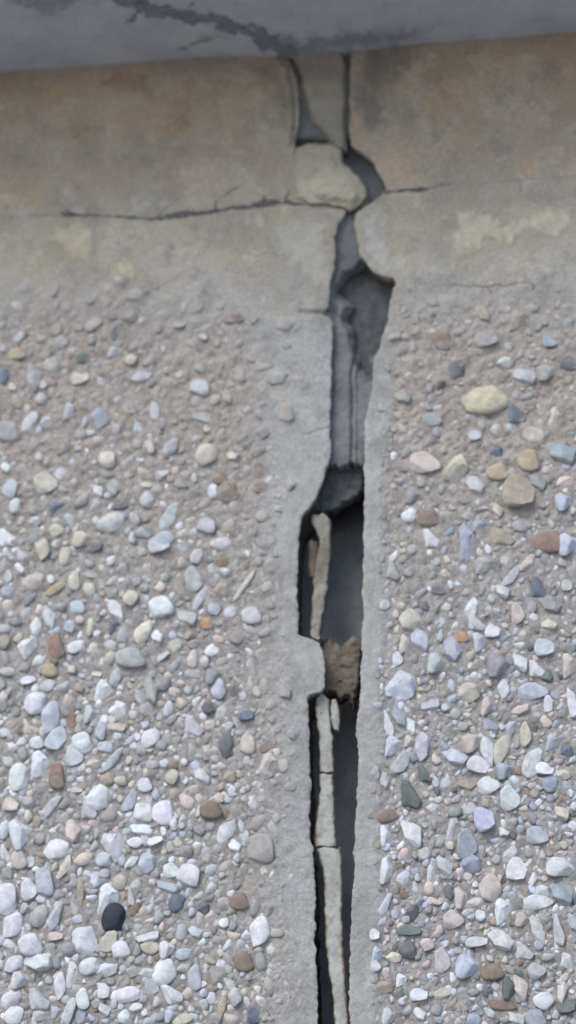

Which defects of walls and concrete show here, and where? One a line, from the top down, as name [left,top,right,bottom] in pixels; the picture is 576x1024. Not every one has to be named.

crack [113,0,297,56]
crack [62,188,340,220]